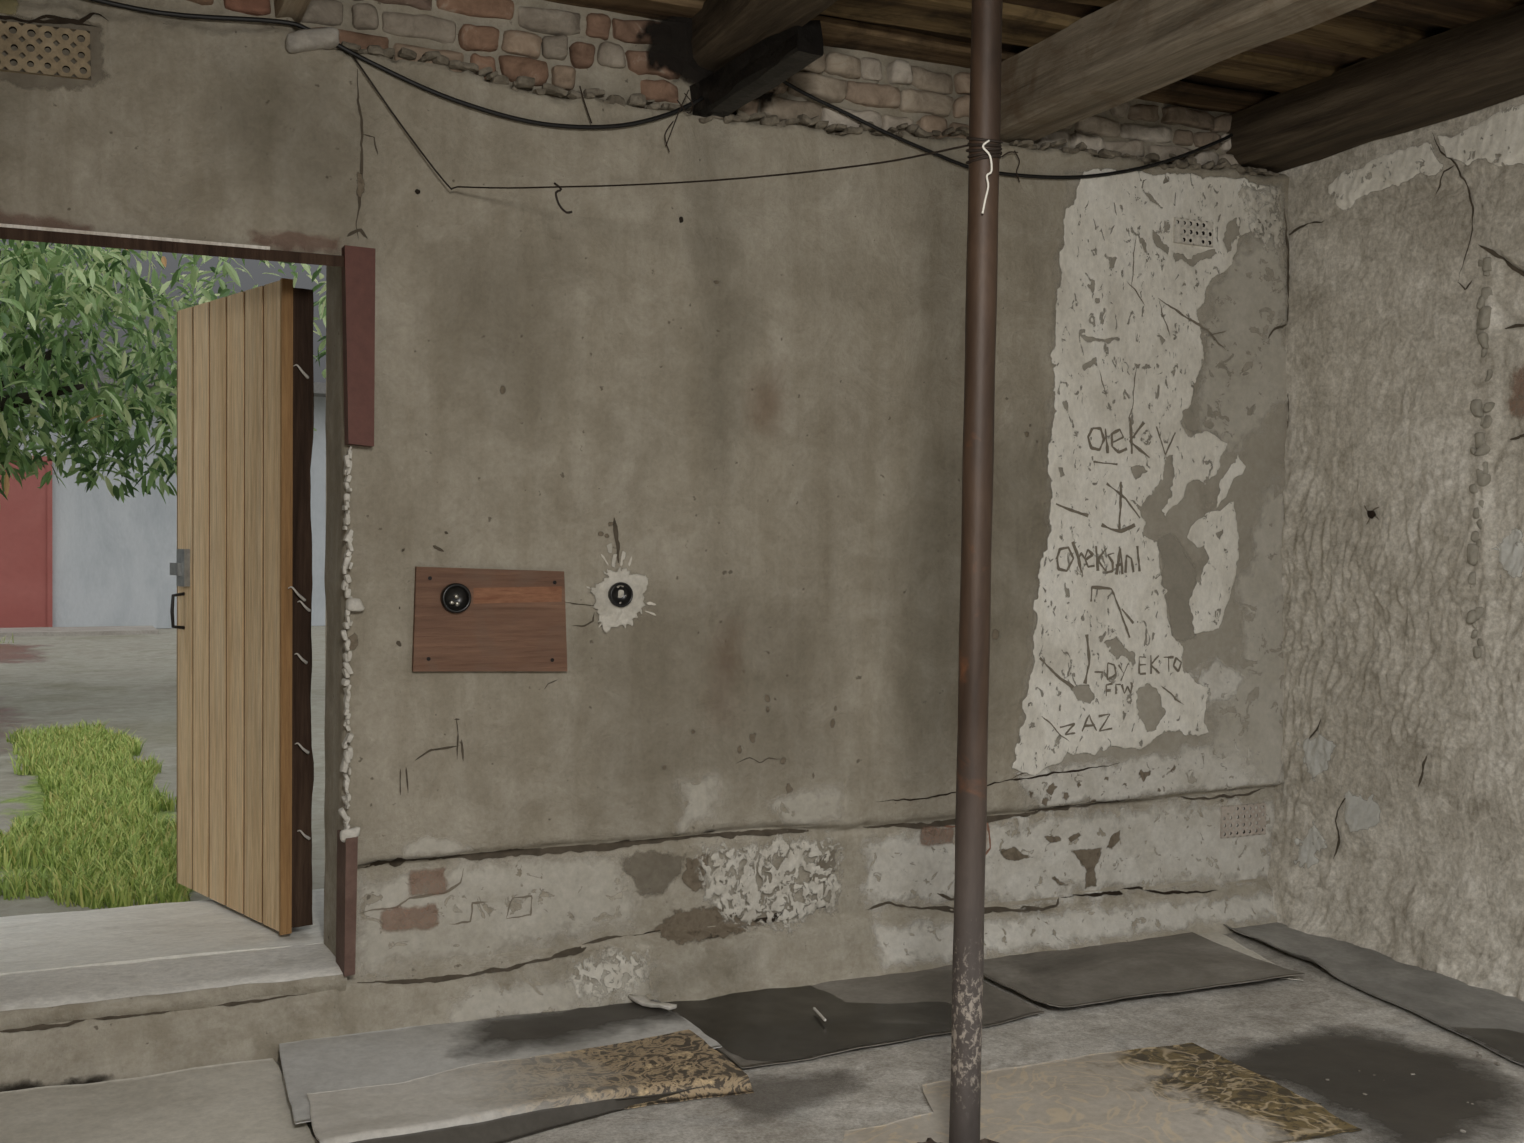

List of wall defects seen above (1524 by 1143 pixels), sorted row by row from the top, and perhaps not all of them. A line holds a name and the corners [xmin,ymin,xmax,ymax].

flaking render [301,0,683,111]
flaking render [698,52,970,139]
peeling [1328,104,1524,210]
crack [1432,132,1474,290]
peeling [1009,102,1336,806]
flaking render [363,868,485,931]
peeling [623,830,844,945]
flaking render [986,823,1029,861]
crack [865,763,1264,829]
flaking render [1045,831,1120,888]
peeling [567,946,650,1004]
leakage [1229,1027,1524,1143]